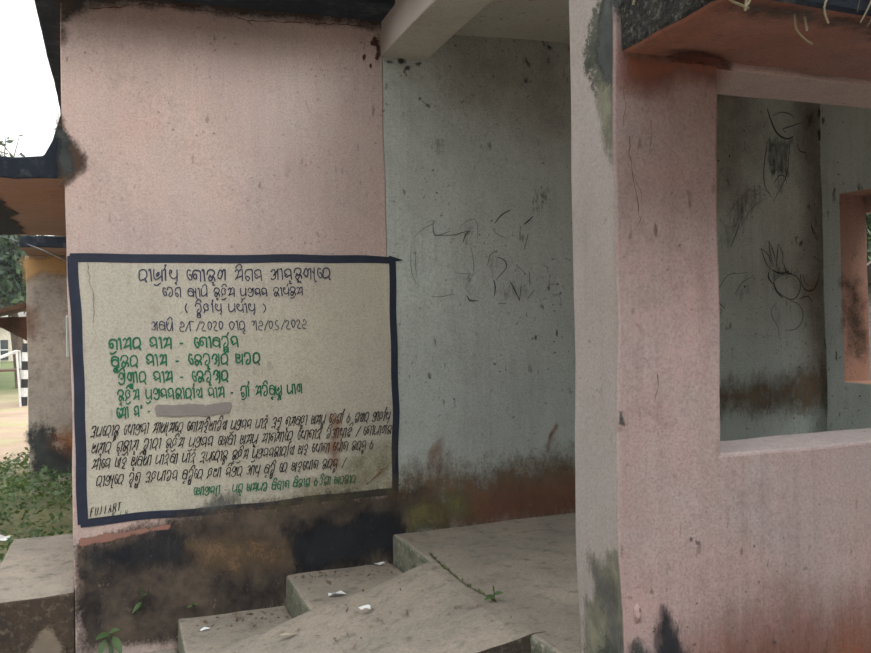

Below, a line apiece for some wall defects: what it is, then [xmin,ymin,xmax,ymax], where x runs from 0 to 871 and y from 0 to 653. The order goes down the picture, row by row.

water stain [597,80,612,157]
water stain [25,424,72,482]
water stain [74,479,450,653]
water stain [631,605,687,653]